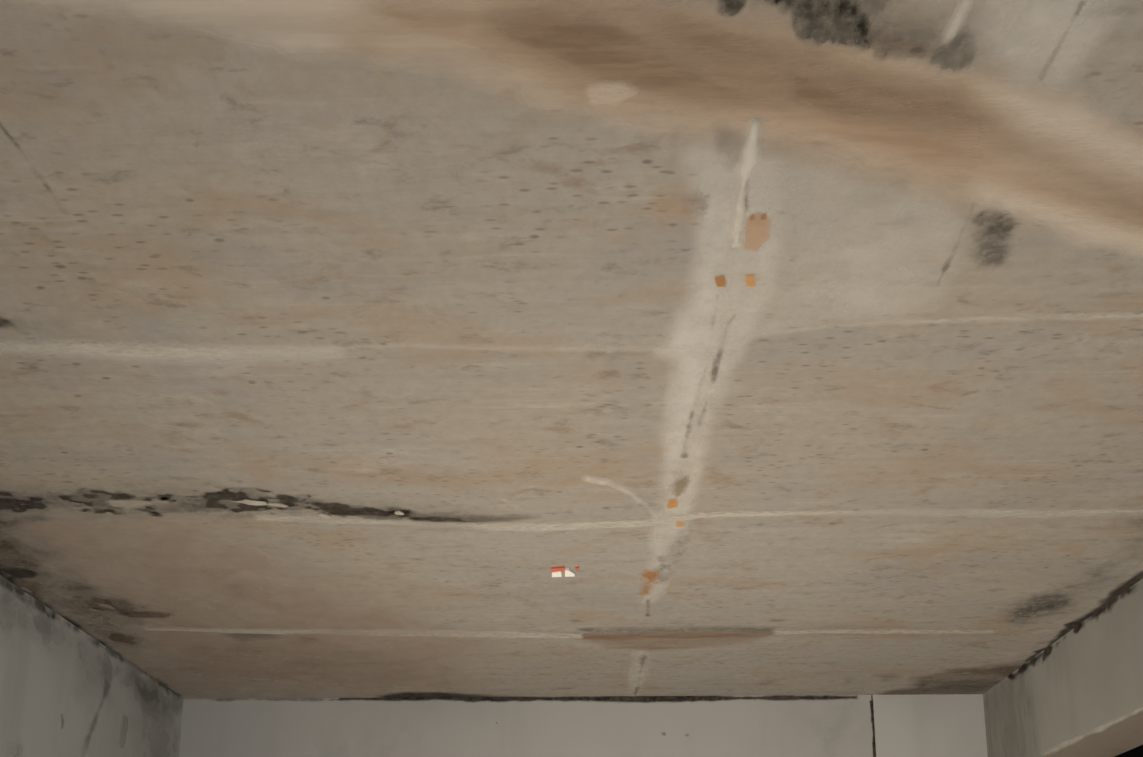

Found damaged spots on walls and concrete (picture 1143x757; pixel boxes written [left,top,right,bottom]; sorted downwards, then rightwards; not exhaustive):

water stain [381,0,985,466]
water stain [974,212,1014,266]
crack [0,318,13,327]
water stain [0,487,514,757]
water stain [572,628,777,696]